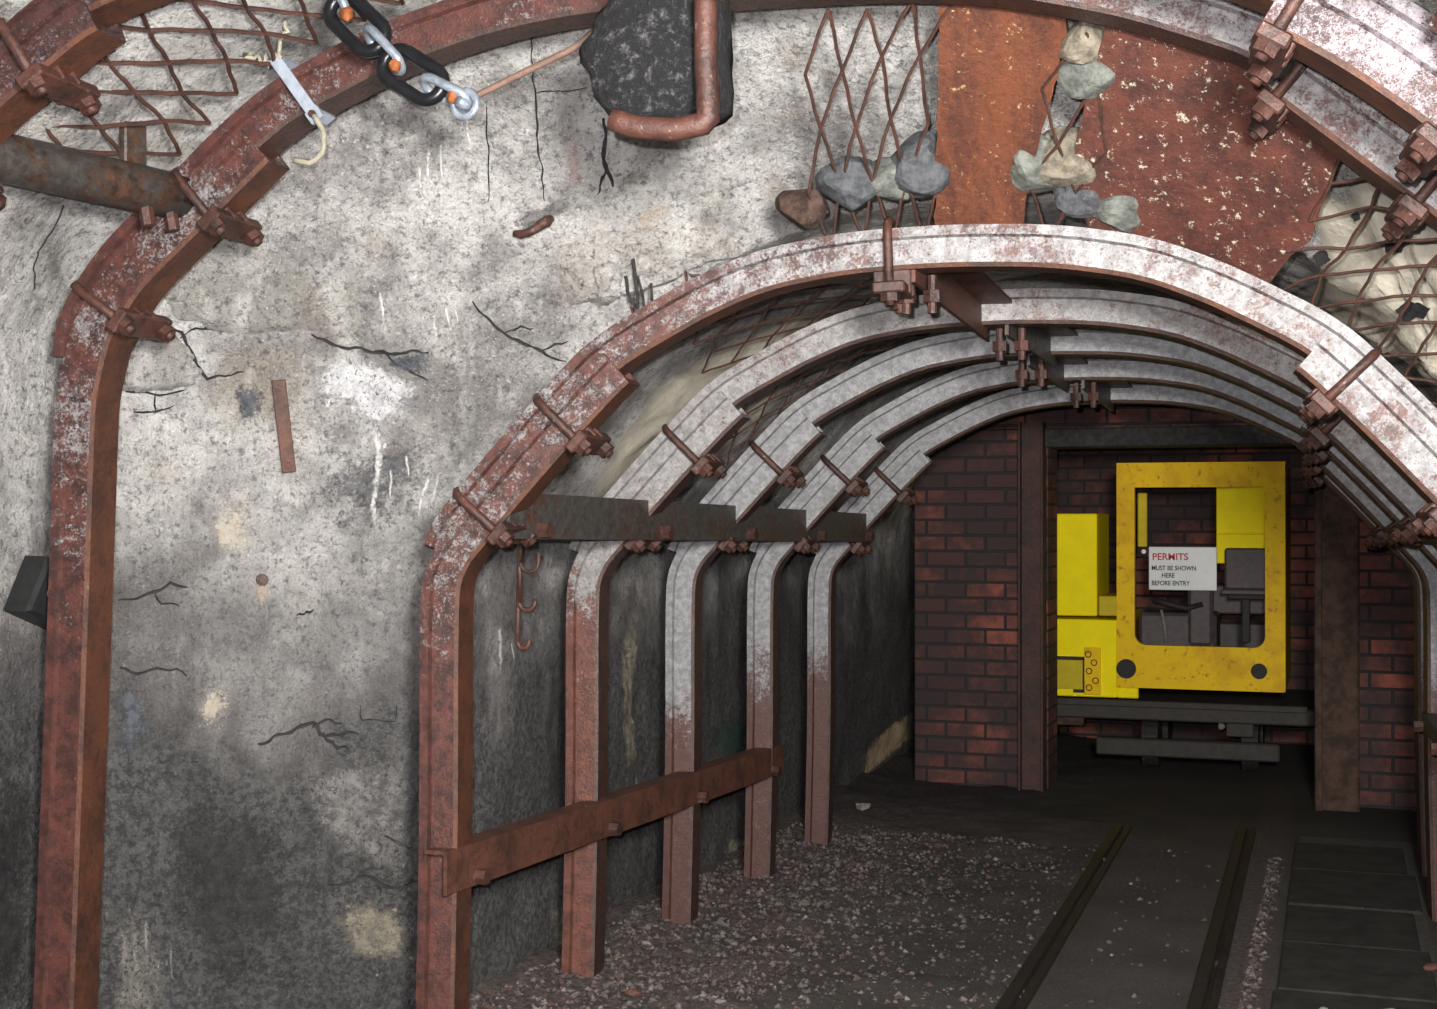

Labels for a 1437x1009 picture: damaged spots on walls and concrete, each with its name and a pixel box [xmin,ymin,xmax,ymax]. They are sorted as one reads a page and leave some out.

crack [472,301,569,362]
crack [125,327,243,413]
crack [311,334,429,380]
crack [118,581,188,606]
crack [120,667,187,676]
crack [258,705,397,750]
crack [311,787,418,896]